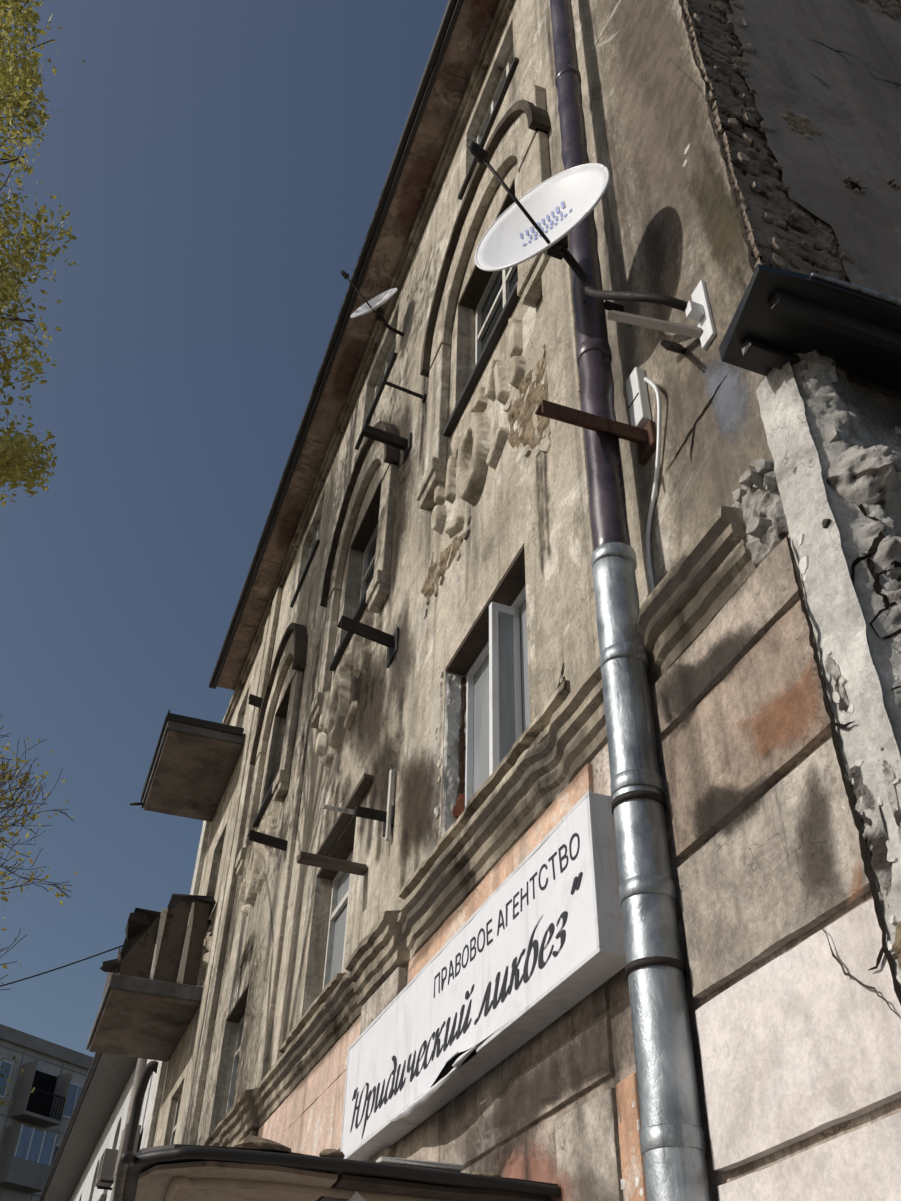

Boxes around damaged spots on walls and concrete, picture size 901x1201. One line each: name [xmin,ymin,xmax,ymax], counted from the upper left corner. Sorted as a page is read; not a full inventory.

flaking render [857,0,901,20]
flaking render [678,0,854,283]
spalling [841,175,867,195]
flaking render [503,343,551,457]
crack [659,374,727,483]
water stain [320,99,551,885]
flaking render [421,516,472,619]
corrosion [742,668,816,753]
peeling [824,651,855,714]
crack [786,533,901,1019]
water stain [795,777,832,897]
spalling [844,747,901,986]